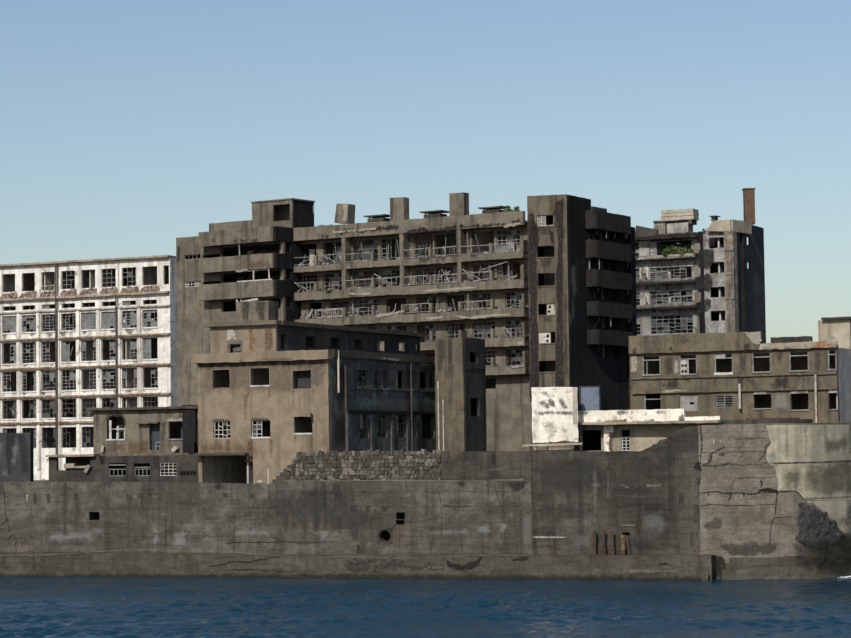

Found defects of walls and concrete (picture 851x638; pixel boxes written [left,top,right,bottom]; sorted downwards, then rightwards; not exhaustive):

crack [0,485,35,569]
crack [694,426,803,553]